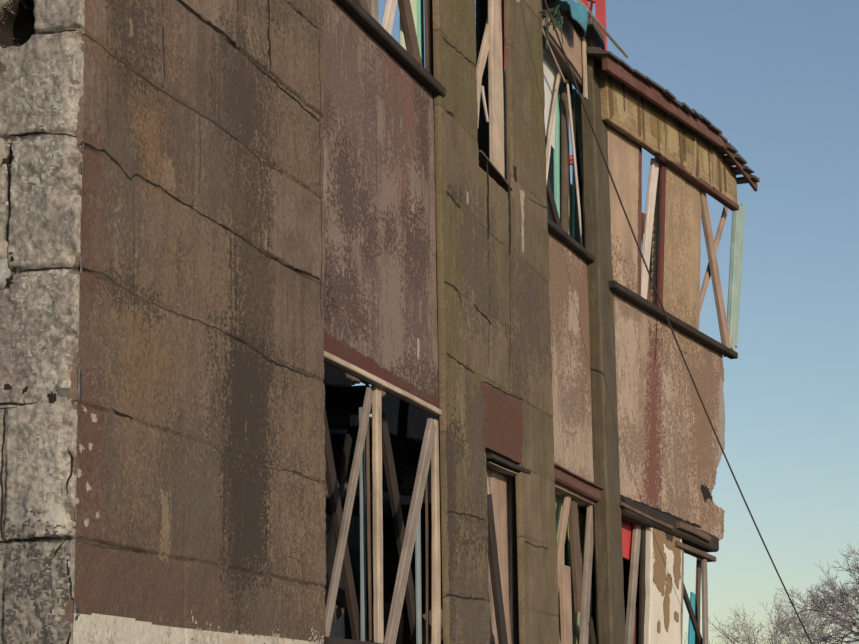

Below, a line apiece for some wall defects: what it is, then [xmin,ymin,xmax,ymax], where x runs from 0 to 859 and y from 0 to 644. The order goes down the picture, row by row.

spalling [0,0,35,48]
water stain [139,0,491,644]
rust [632,320,666,510]
spalling [717,374,725,467]
crack [0,402,146,644]
spalling [701,483,713,503]
peeling [653,527,681,633]